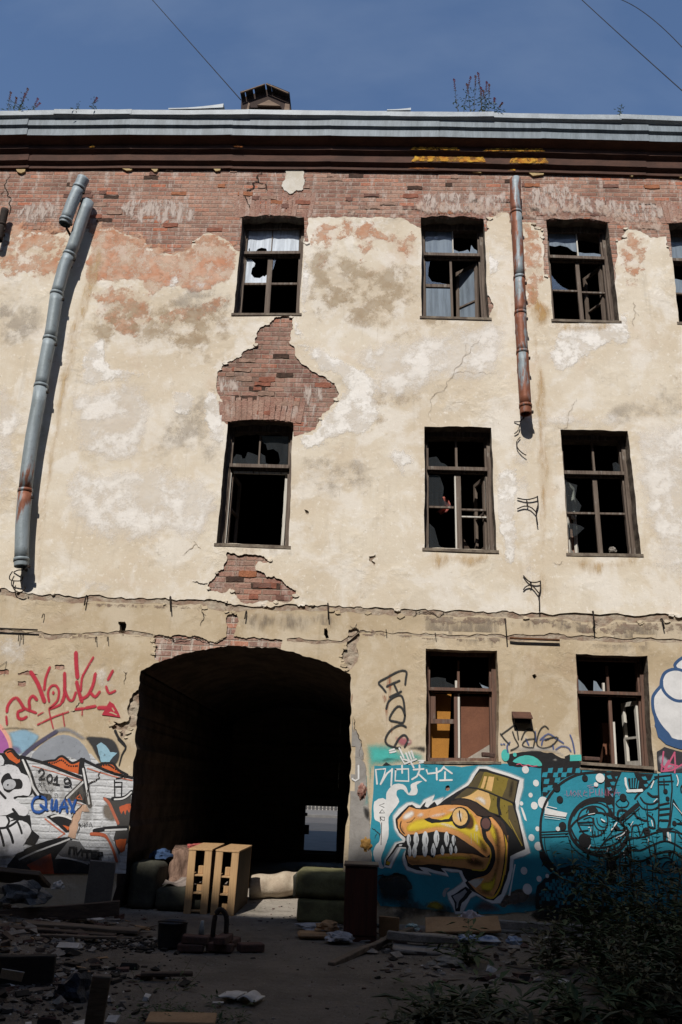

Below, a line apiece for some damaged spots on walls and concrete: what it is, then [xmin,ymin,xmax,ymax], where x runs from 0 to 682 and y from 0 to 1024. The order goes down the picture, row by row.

damp [96,304,226,348]
flaking render [0,169,682,337]
damp [312,253,402,326]
flaking render [205,296,503,448]
crack [158,612,222,643]
flaking render [0,552,682,671]
flaking render [108,690,140,738]